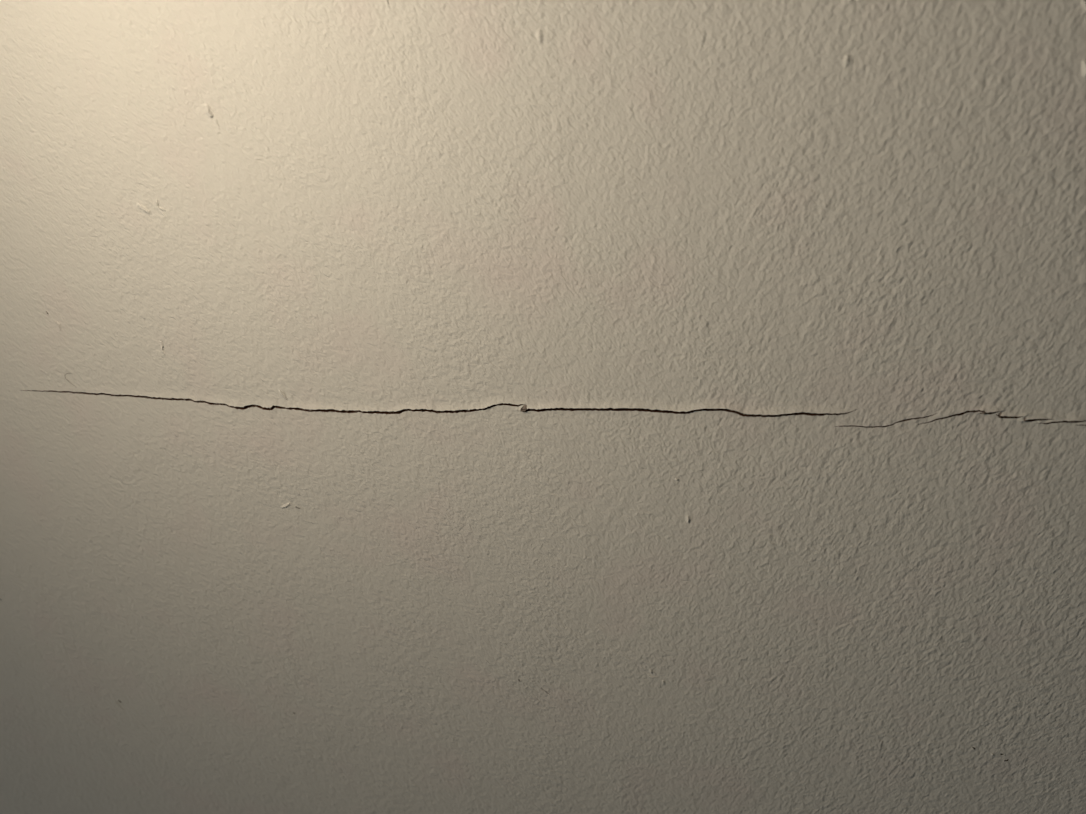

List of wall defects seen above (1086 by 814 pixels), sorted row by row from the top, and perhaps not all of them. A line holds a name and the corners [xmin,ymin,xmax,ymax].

crack [19,386,1086,433]